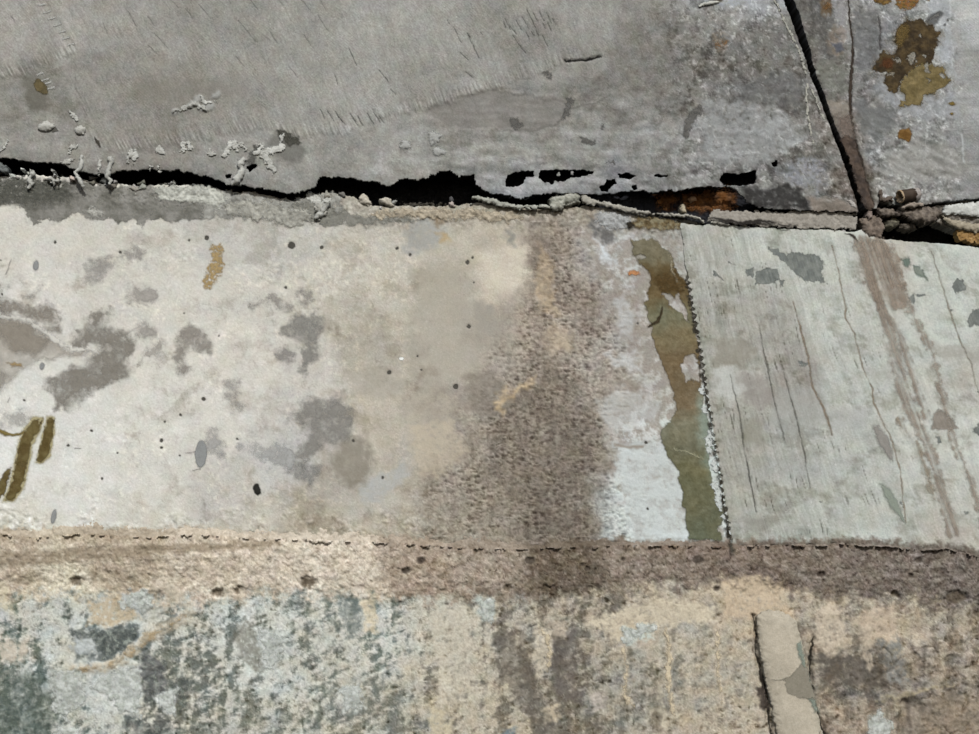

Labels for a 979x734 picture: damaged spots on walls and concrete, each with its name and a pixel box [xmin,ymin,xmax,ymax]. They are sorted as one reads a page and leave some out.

rust [873,0,951,107]
crack [0,158,357,201]
peeling [277,130,301,146]
spalling [311,171,593,221]
crack [429,170,594,209]
damp [596,211,631,231]
peeling [581,115,893,231]
rust [898,128,912,142]
crack [677,0,979,521]
damp [268,294,322,372]
damp [0,296,162,502]
crack [752,614,781,734]